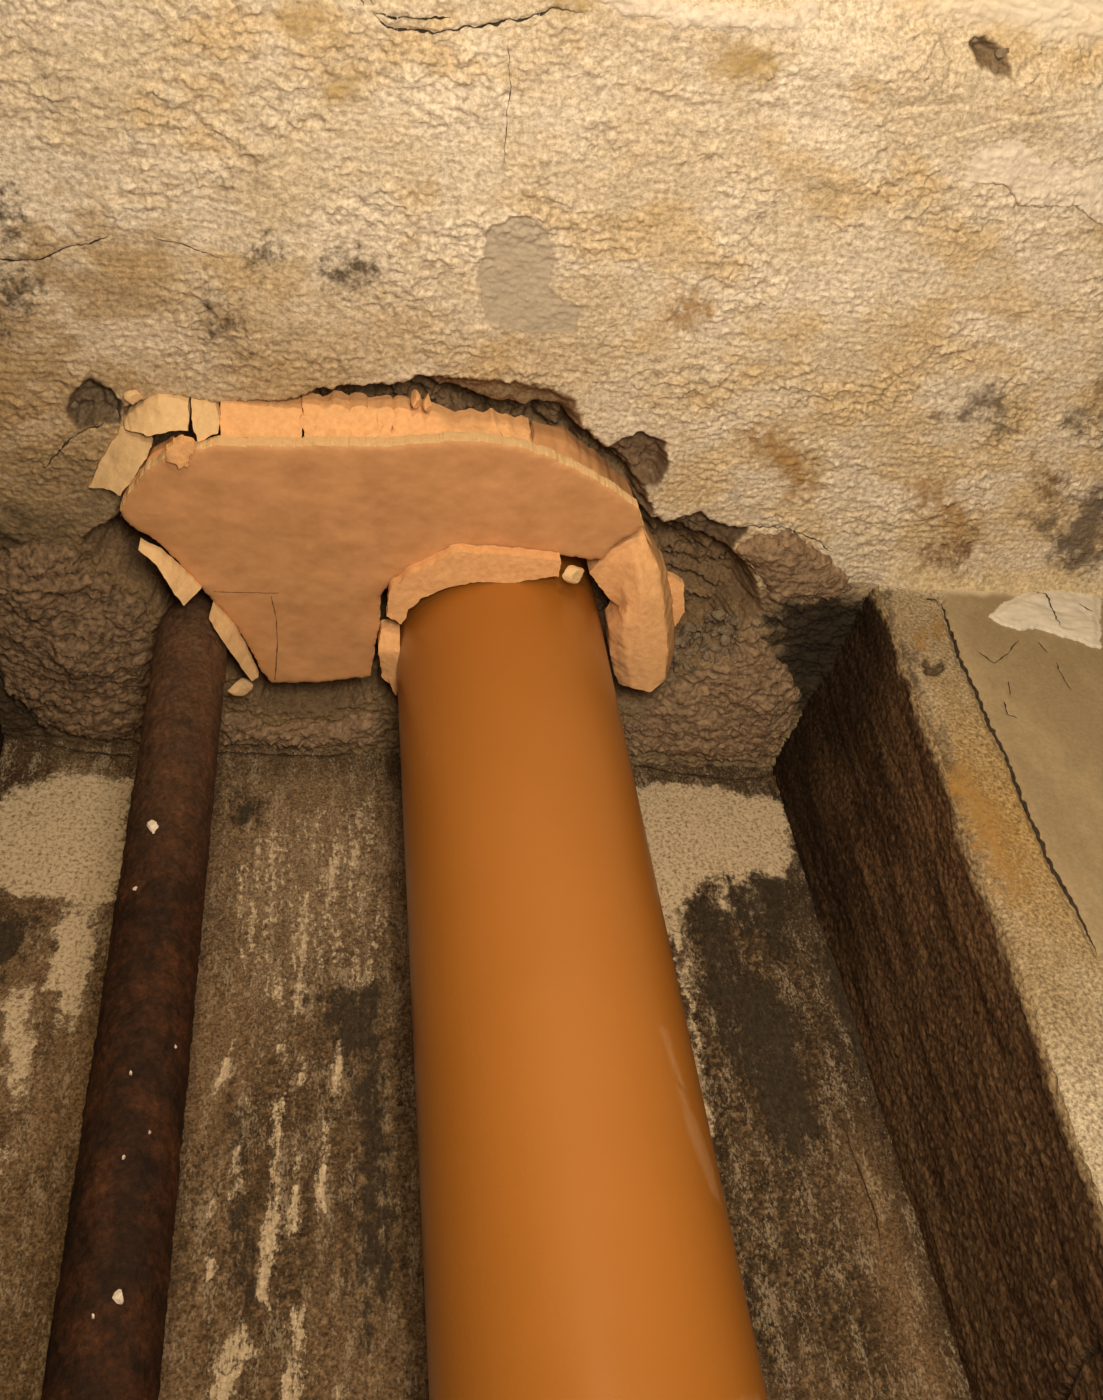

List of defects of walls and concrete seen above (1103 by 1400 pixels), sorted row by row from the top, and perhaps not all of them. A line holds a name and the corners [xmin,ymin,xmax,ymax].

crack [361,0,583,165]
damp [0,255,42,314]
spalling [67,377,143,429]
peeling [411,389,432,412]
spalling [599,431,669,486]
spalling [665,511,748,548]
peeling [562,565,584,584]
peeling [228,678,253,696]
damp [0,768,135,1112]
damp [636,781,870,1180]
damp [228,788,403,1352]